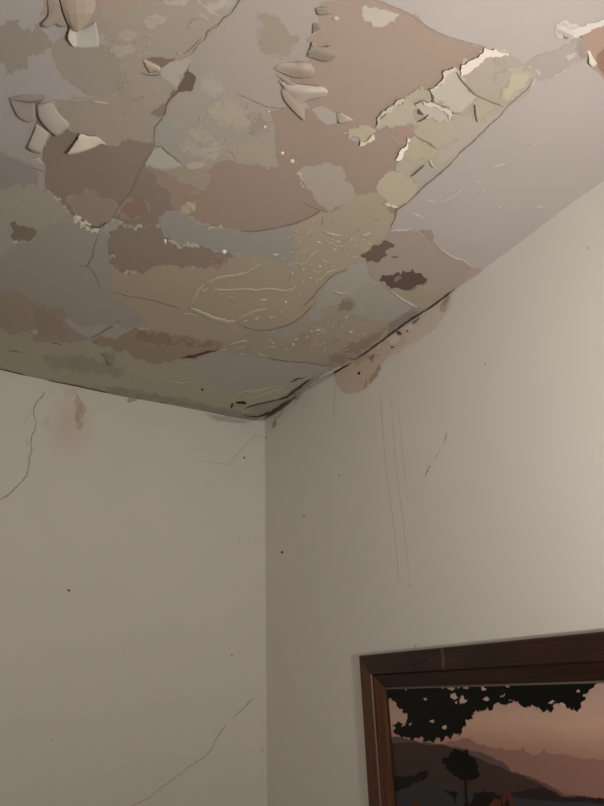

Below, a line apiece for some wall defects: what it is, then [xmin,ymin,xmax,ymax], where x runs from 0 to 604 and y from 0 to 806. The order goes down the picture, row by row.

crack [154,0,240,166]
peeling [572,20,604,78]
crack [73,163,178,308]
peeling [0,0,508,365]
crack [241,201,327,232]
peeling [333,229,481,394]
crack [0,390,46,500]
crack [132,697,255,806]